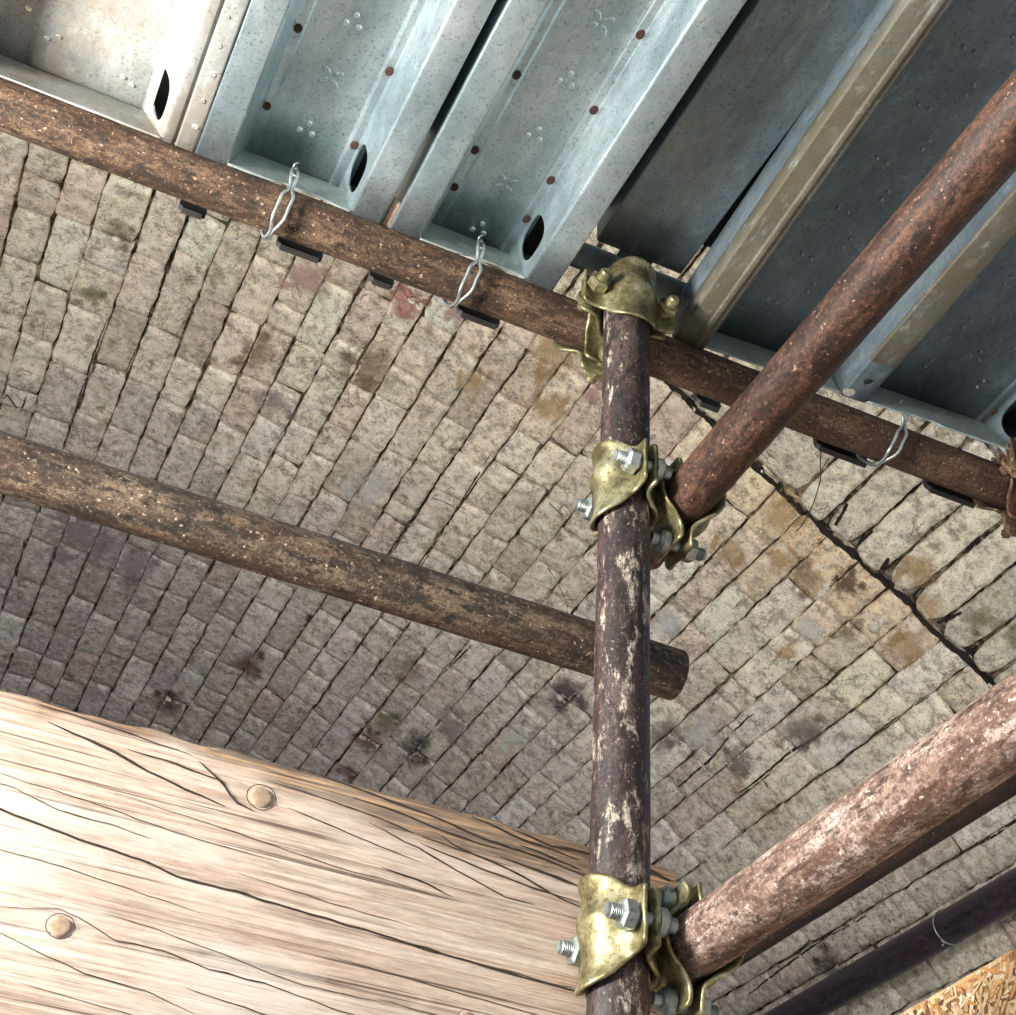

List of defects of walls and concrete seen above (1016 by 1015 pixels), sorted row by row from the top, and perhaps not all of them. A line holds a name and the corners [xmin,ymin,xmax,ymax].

crack [663,381,716,428]
crack [750,461,995,688]
water stain [236,651,265,677]
water stain [155,690,182,713]